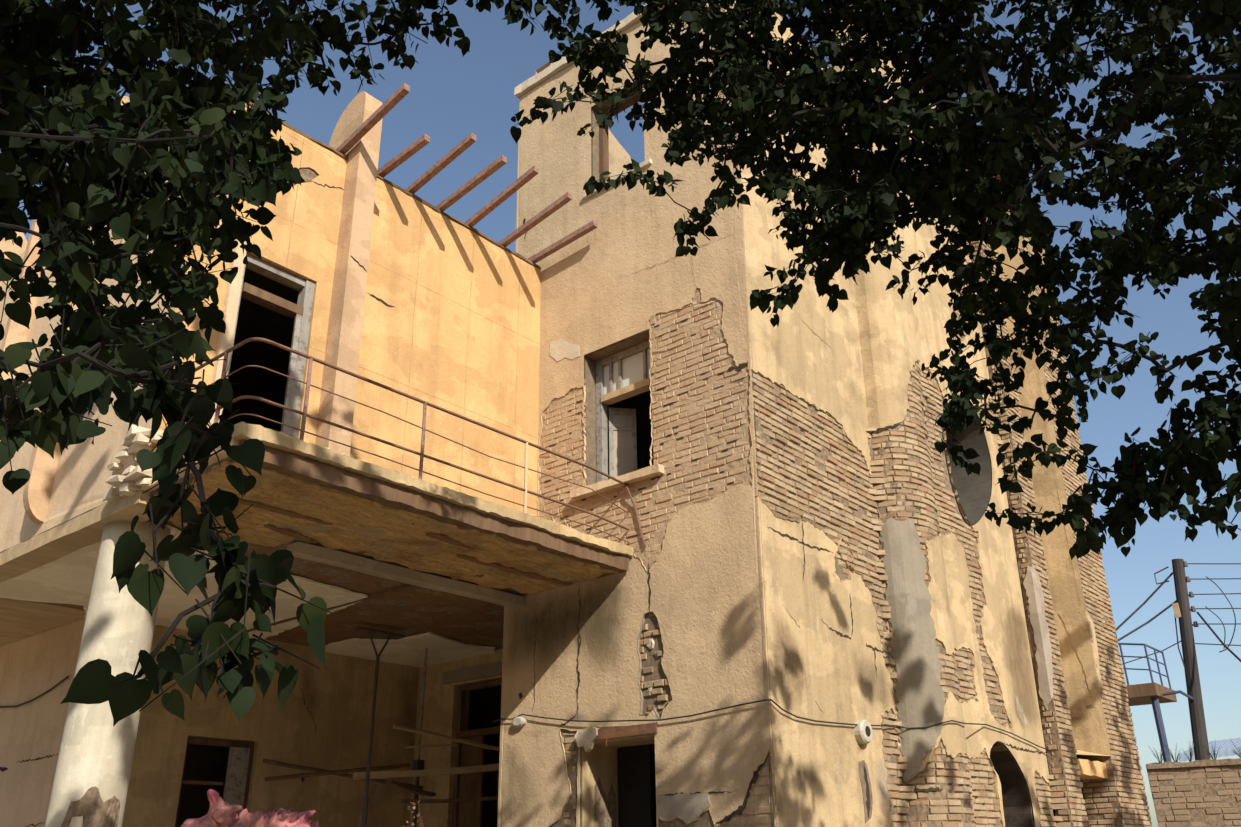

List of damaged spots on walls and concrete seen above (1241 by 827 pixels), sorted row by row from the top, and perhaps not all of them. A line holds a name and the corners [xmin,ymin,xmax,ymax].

flaking render [537,285,1018,728]
crack [557,583,581,728]
spalling [61,786,120,827]
flaking render [549,729,617,827]
crack [665,752,770,826]
flaking render [657,742,779,827]
flaking render [858,708,1004,827]